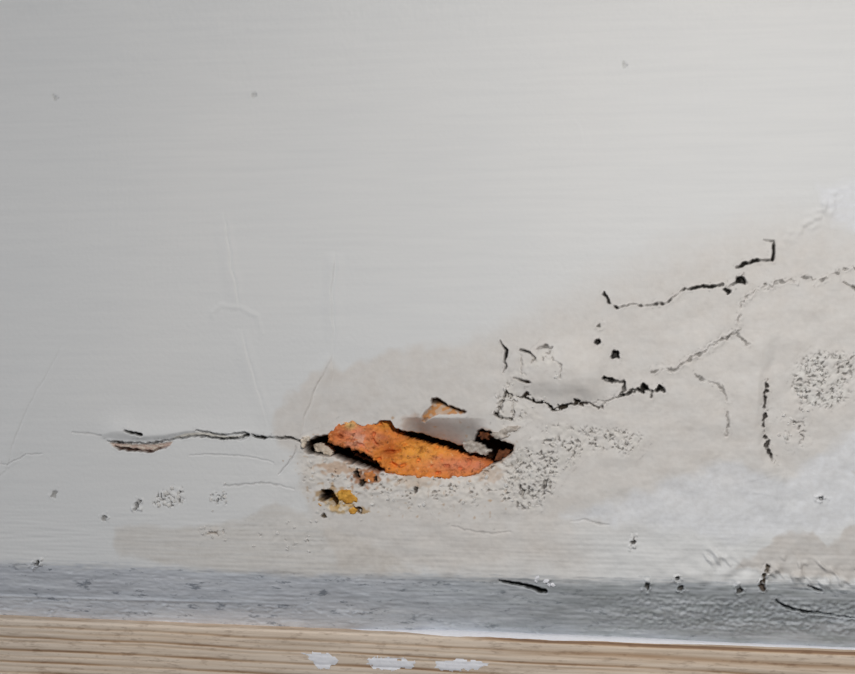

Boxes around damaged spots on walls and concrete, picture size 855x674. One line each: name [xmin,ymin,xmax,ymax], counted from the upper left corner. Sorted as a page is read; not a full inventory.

crack [69,427,299,456]
crack [219,479,297,492]
spalling [279,339,652,524]
damp [111,193,855,584]
crack [489,236,855,441]
crack [758,377,779,466]